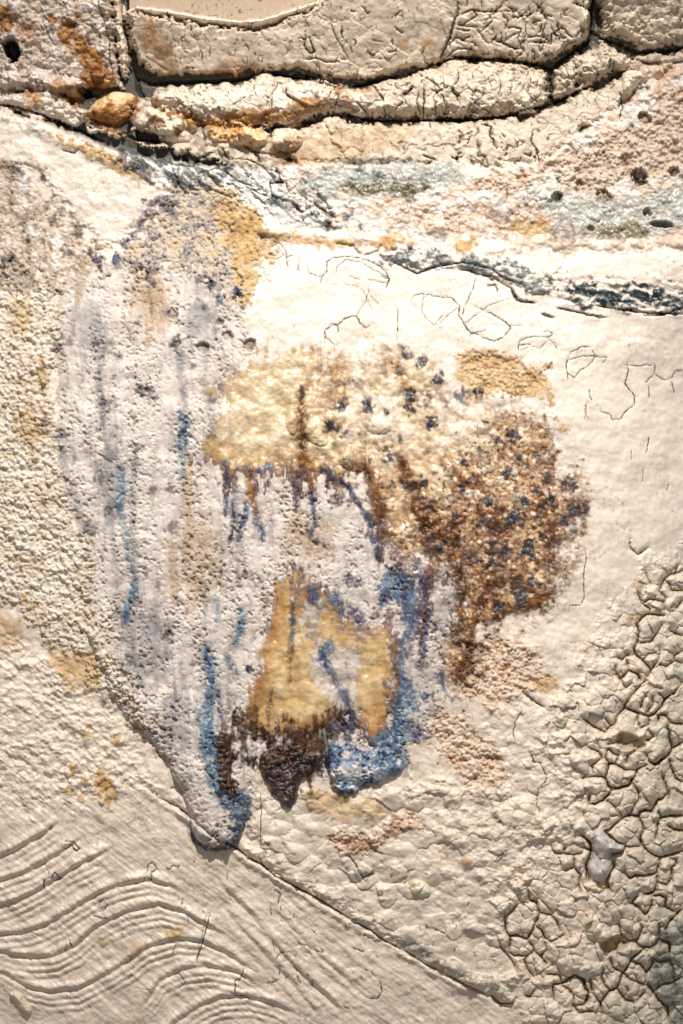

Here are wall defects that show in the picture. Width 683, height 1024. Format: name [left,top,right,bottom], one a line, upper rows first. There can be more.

rust [0,4,330,137]
crack [0,0,683,213]
crack [262,237,683,420]
leakage [177,412,188,450]
leakage [50,651,101,689]
leakage [116,465,138,624]
leakage [189,343,589,851]
leakage [65,763,118,807]
crack [452,541,682,1015]
crack [163,795,436,1011]